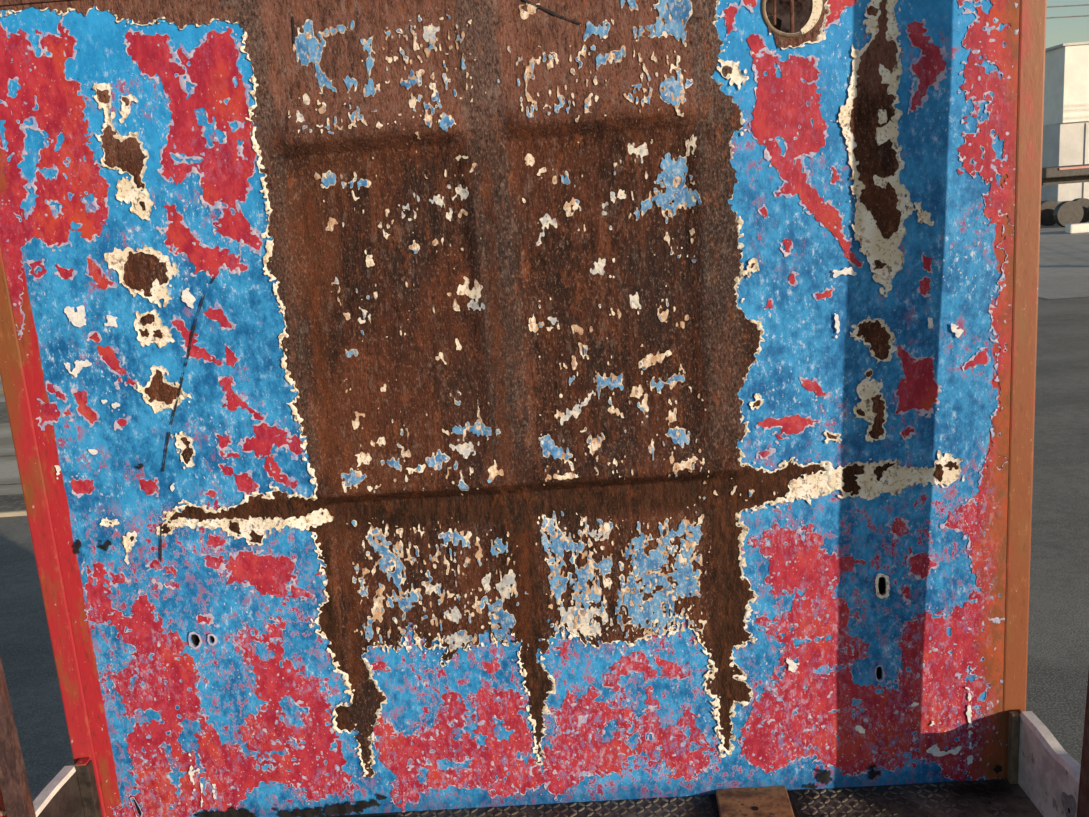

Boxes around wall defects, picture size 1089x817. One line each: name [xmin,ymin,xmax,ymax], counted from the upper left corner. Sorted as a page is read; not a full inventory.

peeling [123,26,263,279]
peeling [288,9,476,153]
peeling [507,0,693,122]
peeling [602,134,702,263]
corrosion [836,0,934,297]
peeling [169,301,305,499]
corrosion [0,0,833,778]
peeling [341,297,720,812]
corrosion [824,430,842,444]
corrosion [850,316,898,442]
corrosion [785,450,965,505]
peeling [737,0,1020,782]